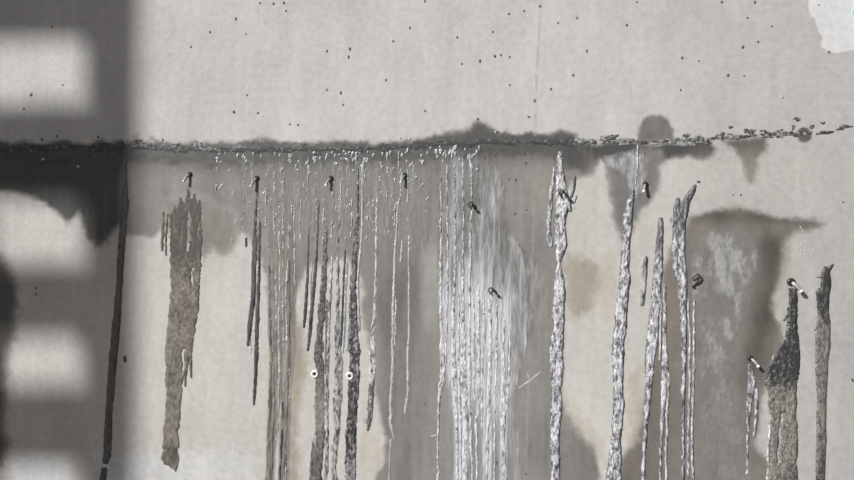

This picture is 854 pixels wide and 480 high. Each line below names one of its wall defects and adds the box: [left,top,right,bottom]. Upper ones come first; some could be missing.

damp [0,115,825,480]